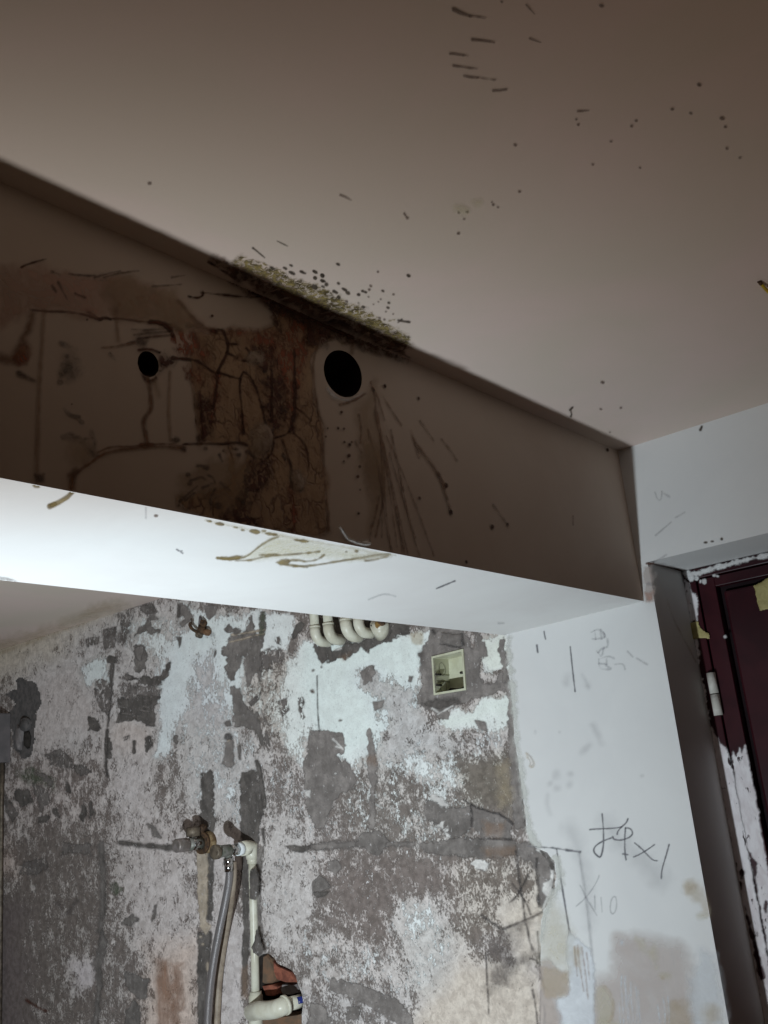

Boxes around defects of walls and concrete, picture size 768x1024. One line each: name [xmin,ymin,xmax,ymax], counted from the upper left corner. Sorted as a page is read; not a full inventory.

damp [47,374,186,509]
crack [32,292,303,491]
damp [171,257,421,567]
peeling [86,604,171,759]
peeling [204,604,305,768]
peeling [313,617,410,685]
peeling [303,728,389,855]
peeling [408,627,562,938]
peeling [701,678,768,1024]
spalling [259,954,301,1001]
peeling [263,1003,331,1024]
peeling [329,978,413,1024]